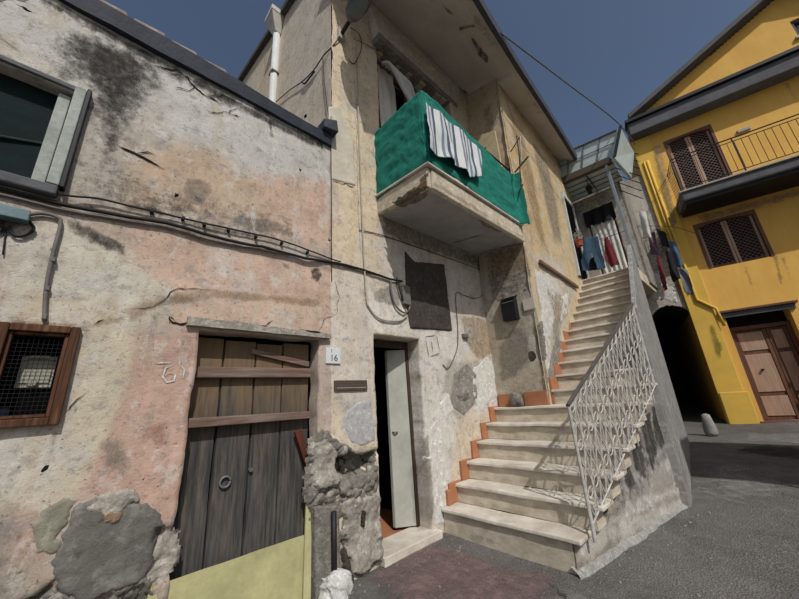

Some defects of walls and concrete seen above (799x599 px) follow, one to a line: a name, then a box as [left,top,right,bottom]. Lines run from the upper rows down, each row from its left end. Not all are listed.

water stain [75,21,322,148]
crack [155,65,242,117]
crack [119,146,164,169]
spalling [392,172,429,207]
crack [140,288,204,325]
peeling [528,269,568,378]
water stain [624,407,664,488]
flaking render [87,489,140,524]
spalling [302,399,384,581]
spalling [108,524,181,599]
spalling [25,582,75,599]